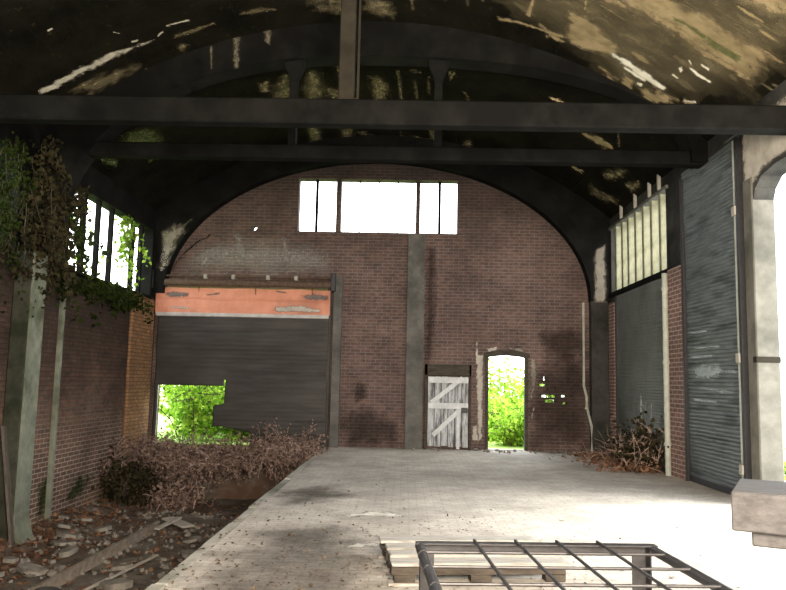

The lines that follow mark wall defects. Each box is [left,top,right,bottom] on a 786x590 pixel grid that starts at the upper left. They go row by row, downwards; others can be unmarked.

peeling [370,1,392,15]
peeling [498,0,786,104]
peeling [77,68,136,95]
peeling [258,74,290,98]
peeling [305,71,338,99]
peeling [371,78,386,100]
leakage [538,332,583,437]